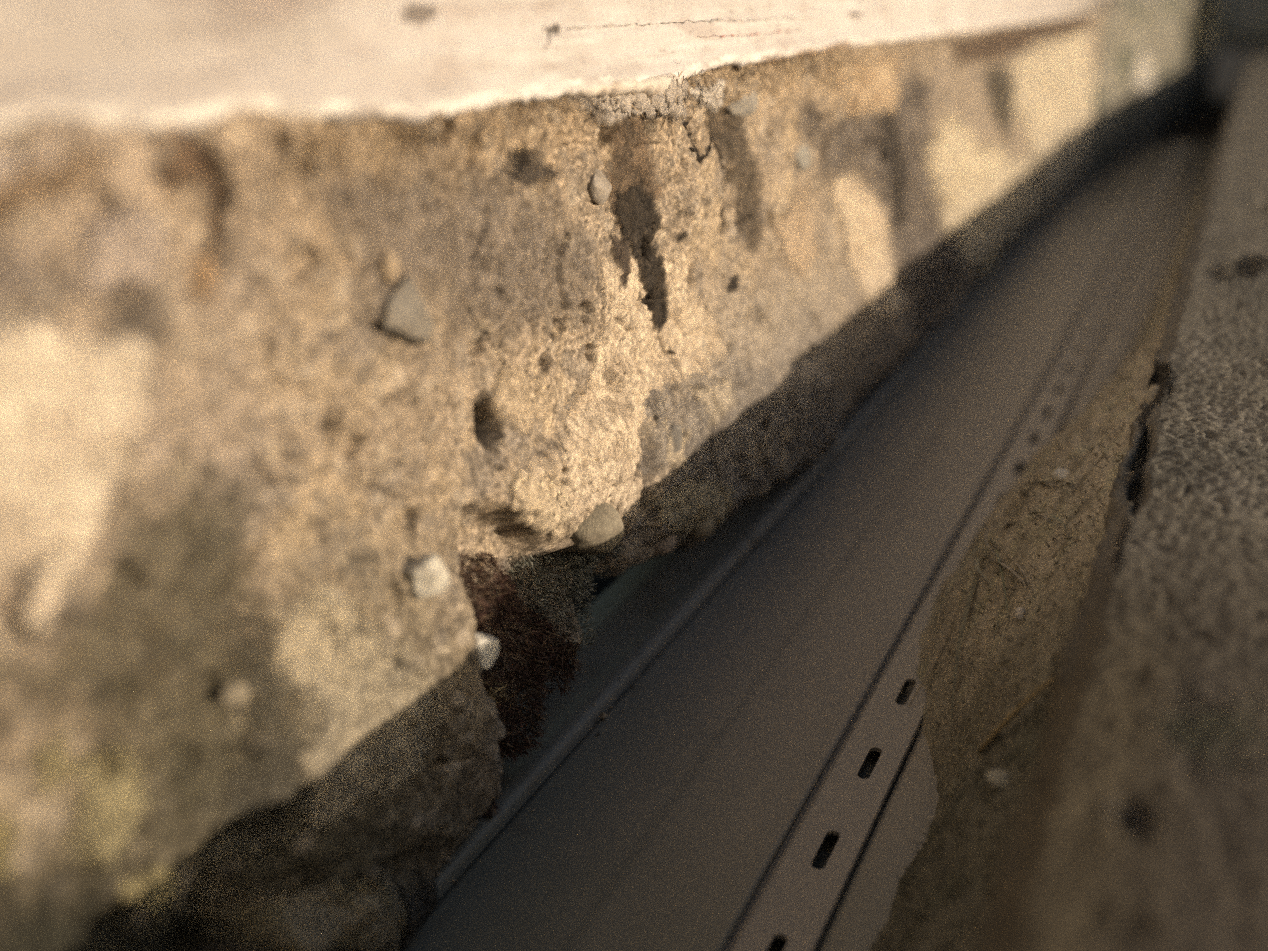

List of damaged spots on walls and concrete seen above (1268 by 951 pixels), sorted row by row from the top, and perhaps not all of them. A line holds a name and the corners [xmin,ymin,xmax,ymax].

peeling [571,73,725,127]
spalling [833,56,902,114]
spalling [927,25,1096,278]
spalling [727,275,740,294]
spalling [776,186,817,277]
spalling [832,175,907,321]
spalling [472,362,549,447]
spalling [506,232,727,541]
spalling [271,587,443,830]
spalling [120,867,180,913]
spalling [190,873,406,951]